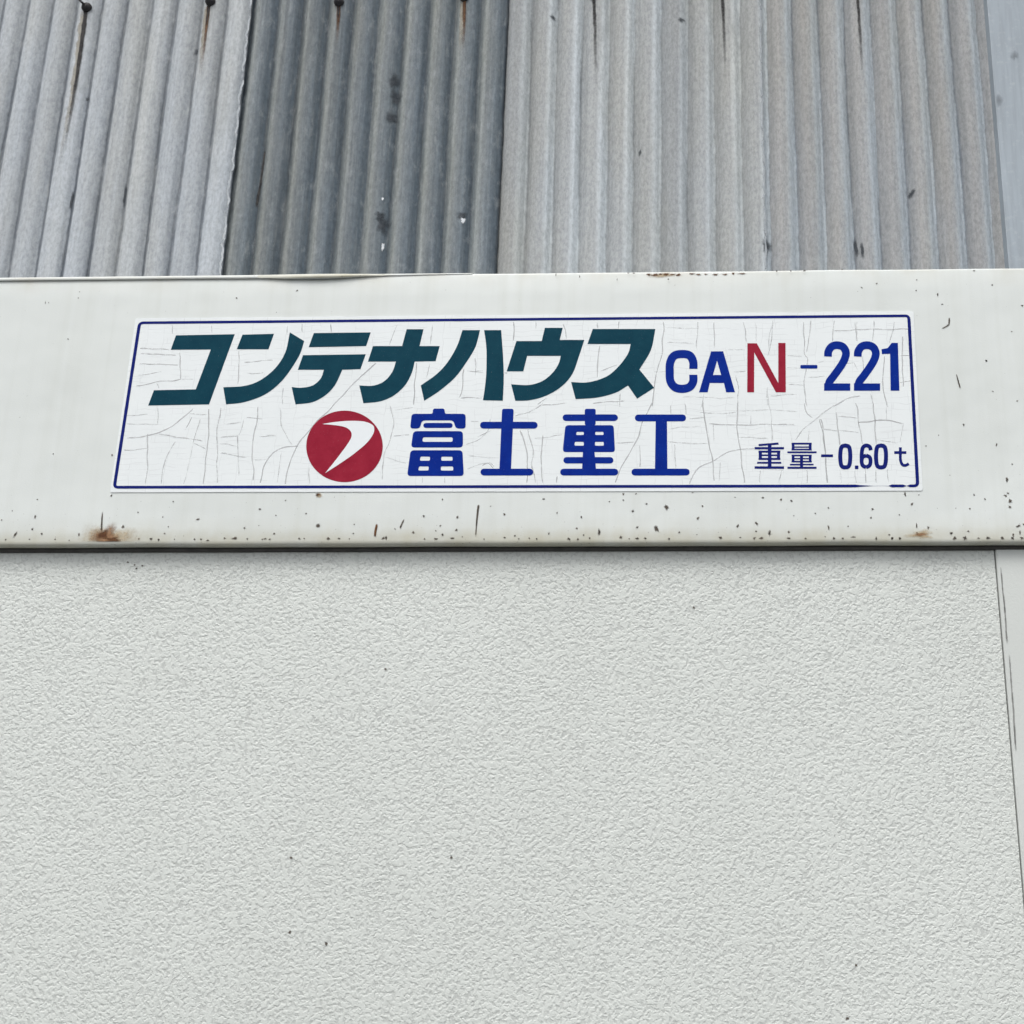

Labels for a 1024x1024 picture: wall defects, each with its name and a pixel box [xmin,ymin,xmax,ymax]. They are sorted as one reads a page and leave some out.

corrosion [70,11,88,114]
corrosion [91,513,127,541]